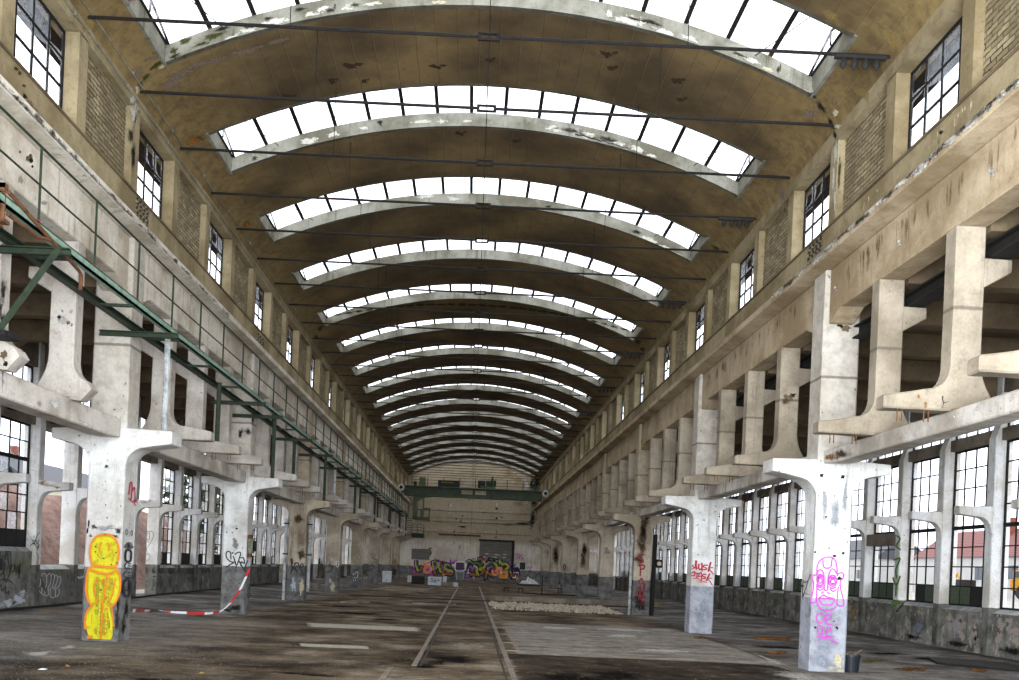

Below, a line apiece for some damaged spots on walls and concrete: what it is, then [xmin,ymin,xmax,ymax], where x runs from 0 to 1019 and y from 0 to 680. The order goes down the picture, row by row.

peeling [305,1,382,17]
peeling [225,18,290,40]
peeling [606,10,698,43]
peeling [733,52,775,72]
peeling [545,125,656,157]